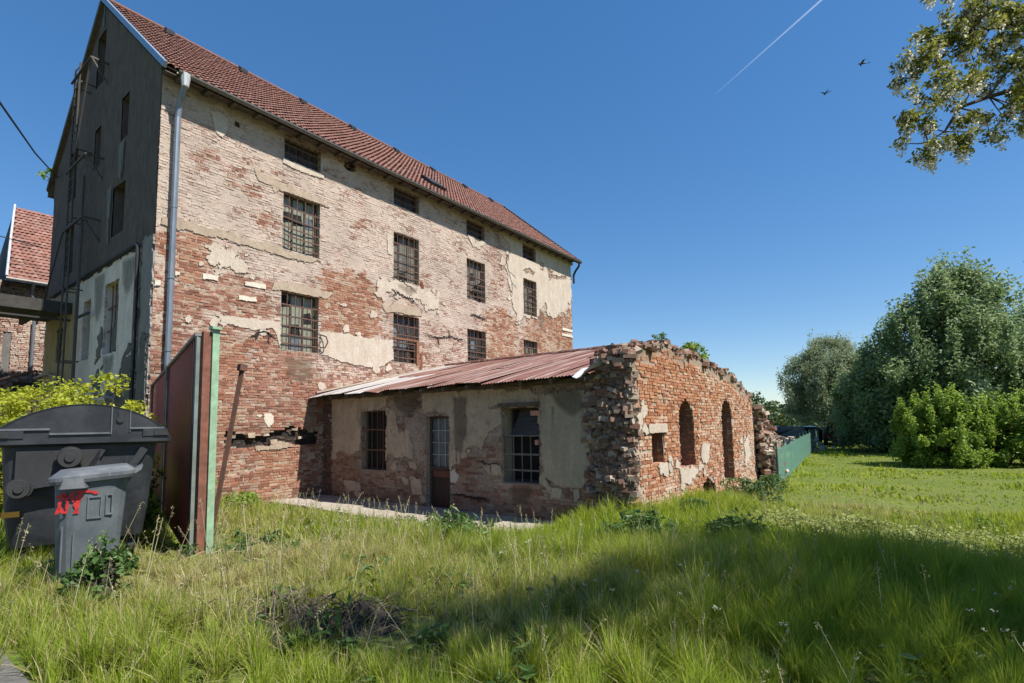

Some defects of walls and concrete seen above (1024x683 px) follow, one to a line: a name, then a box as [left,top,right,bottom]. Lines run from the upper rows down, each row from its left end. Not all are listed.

flaking render [154,217,255,284]
crack [251,330,276,343]
flaking render [483,294,573,358]
peeling [630,399,649,436]